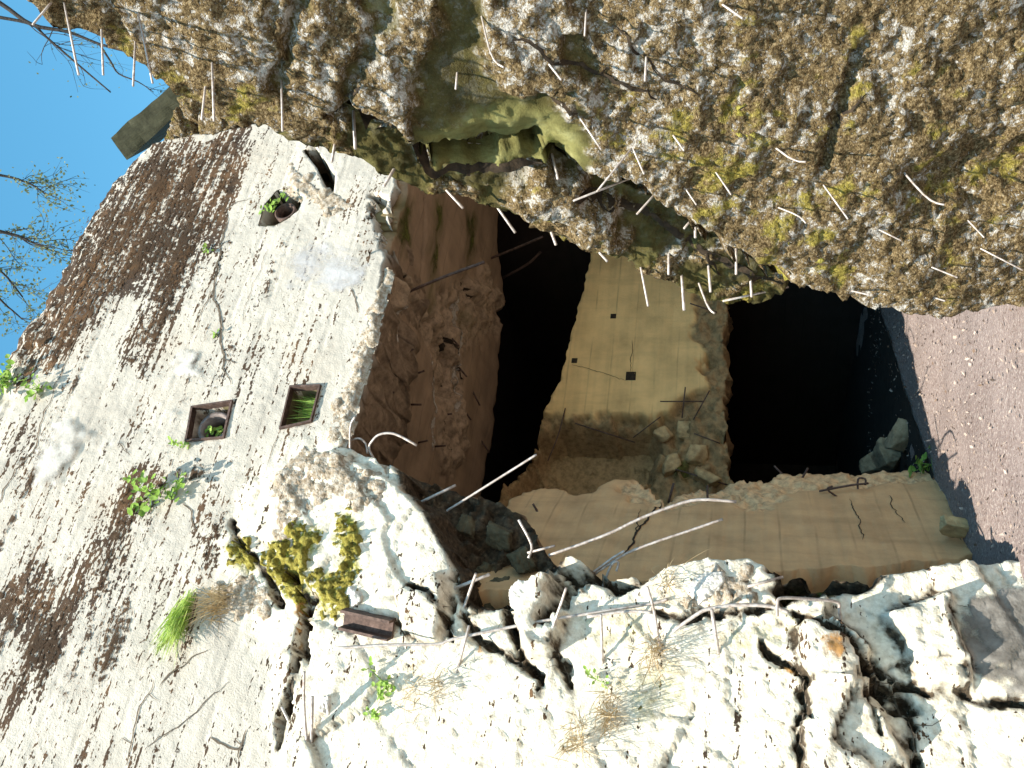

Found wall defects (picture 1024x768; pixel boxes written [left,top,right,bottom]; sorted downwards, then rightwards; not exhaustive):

spalling [903,172,945,206]
leakage [13,125,243,499]
spalling [667,253,766,314]
spalling [446,408,660,512]
leakage [0,445,208,704]
leakage [198,506,228,574]
crack [223,540,313,614]
crack [422,587,570,693]
spalling [517,469,737,559]
spalling [593,518,723,587]
crack [659,604,767,624]
crack [850,590,1024,768]